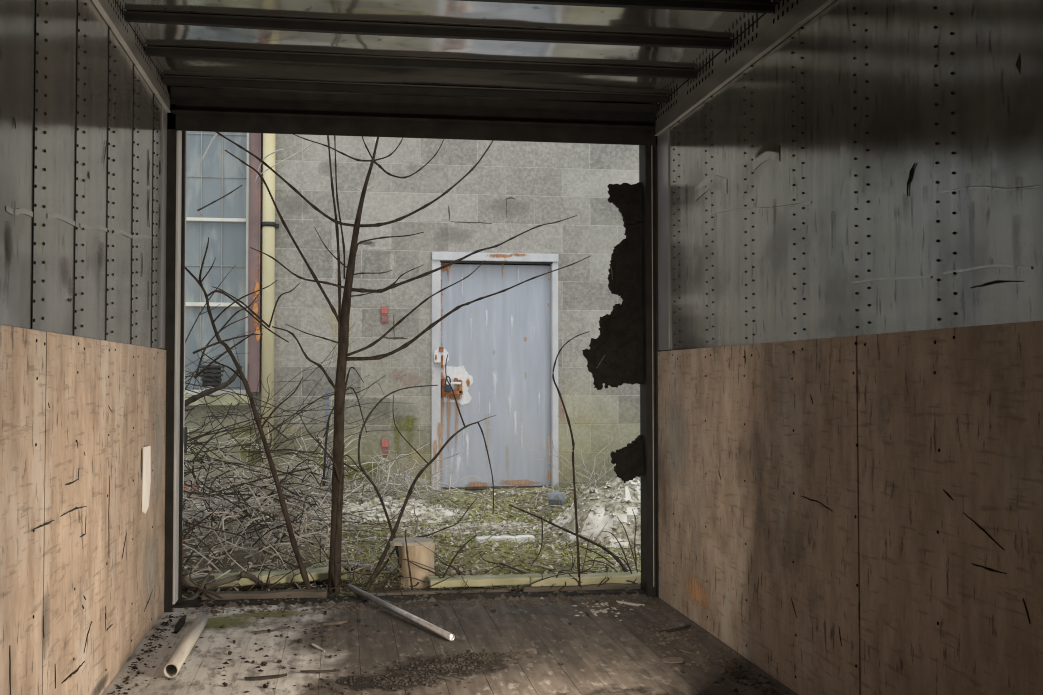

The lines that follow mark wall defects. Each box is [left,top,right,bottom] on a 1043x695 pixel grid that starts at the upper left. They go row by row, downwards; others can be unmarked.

corrosion [433,372,470,468]